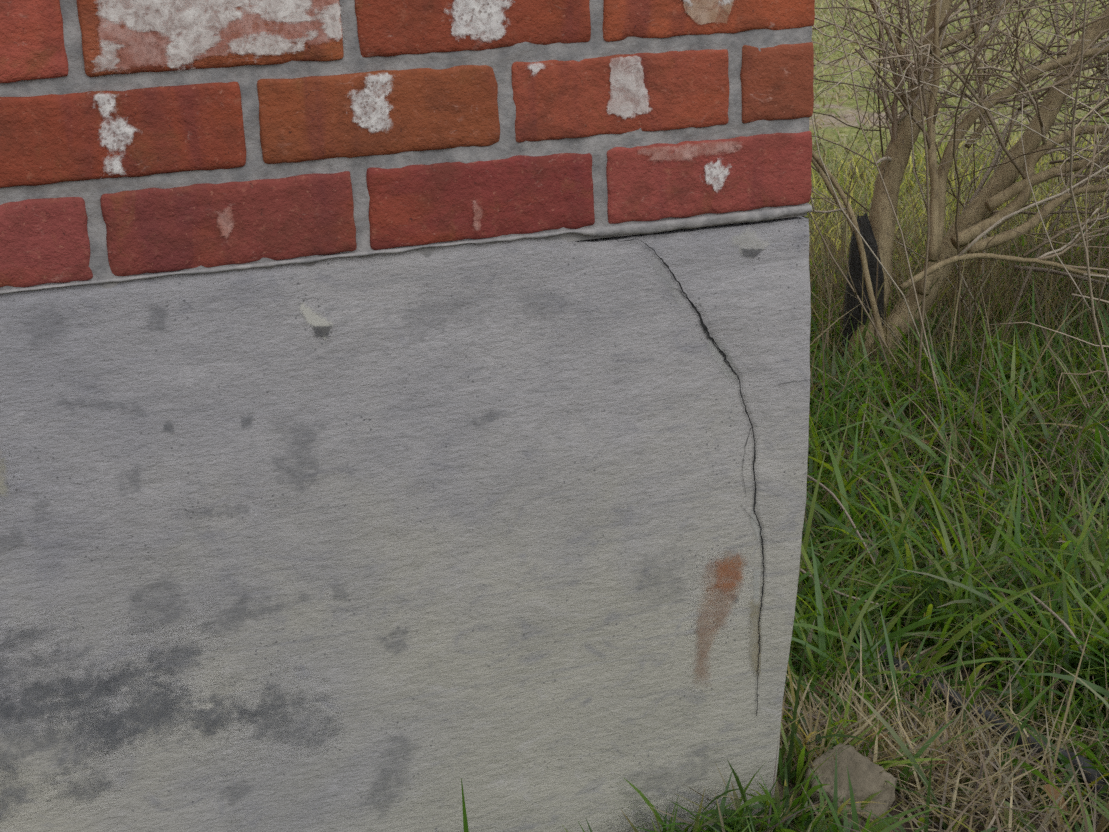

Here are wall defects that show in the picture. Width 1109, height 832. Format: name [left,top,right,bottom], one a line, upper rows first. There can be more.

crack [613,236,765,716]